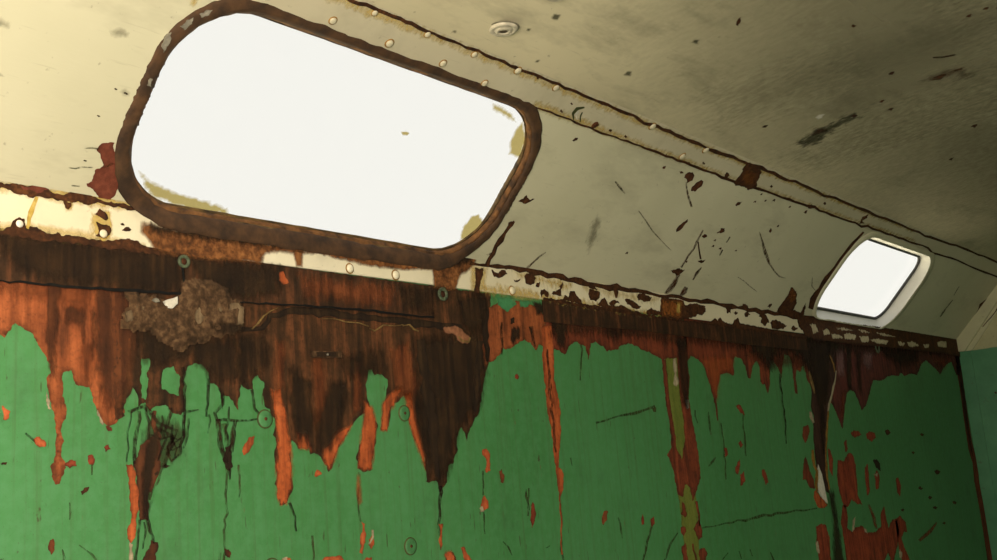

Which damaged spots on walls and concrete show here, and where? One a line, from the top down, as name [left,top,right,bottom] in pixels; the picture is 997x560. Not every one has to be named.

peeling [0,281,178,485]
peeling [219,303,244,325]
peeling [242,436,254,455]
rust [0,209,992,560]
peeling [443,296,813,558]
rust [535,106,997,310]
peeling [767,287,806,315]
leakage [798,113,858,146]